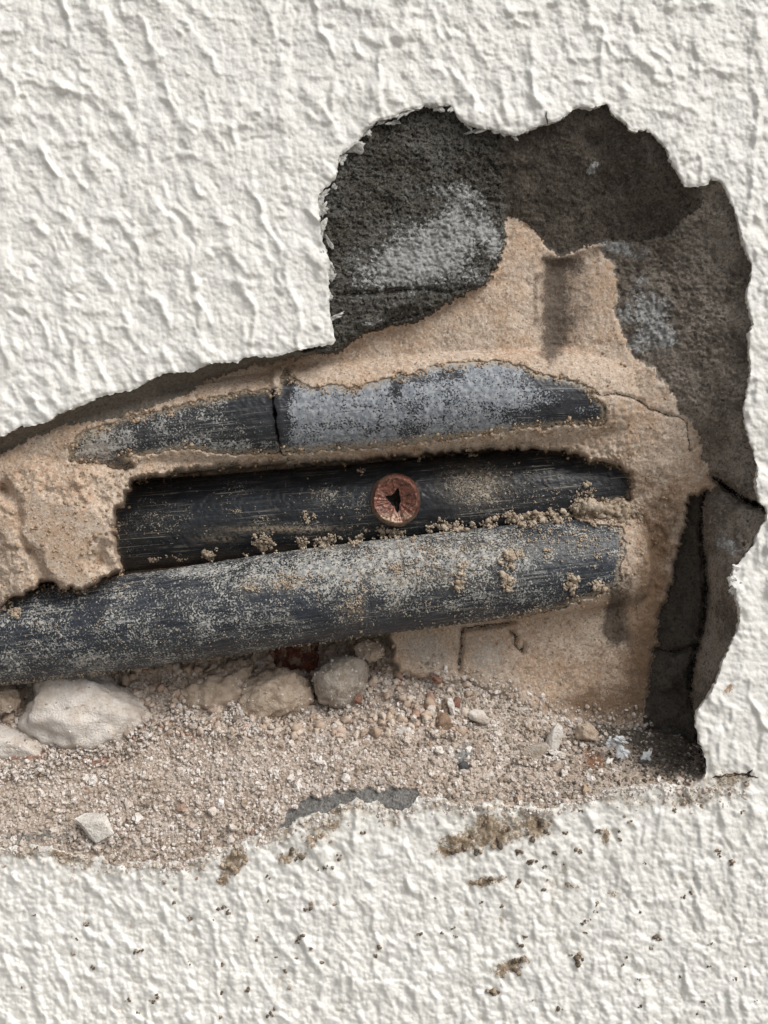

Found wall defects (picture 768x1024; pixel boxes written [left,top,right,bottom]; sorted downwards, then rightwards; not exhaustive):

spalling [0,105,766,883]